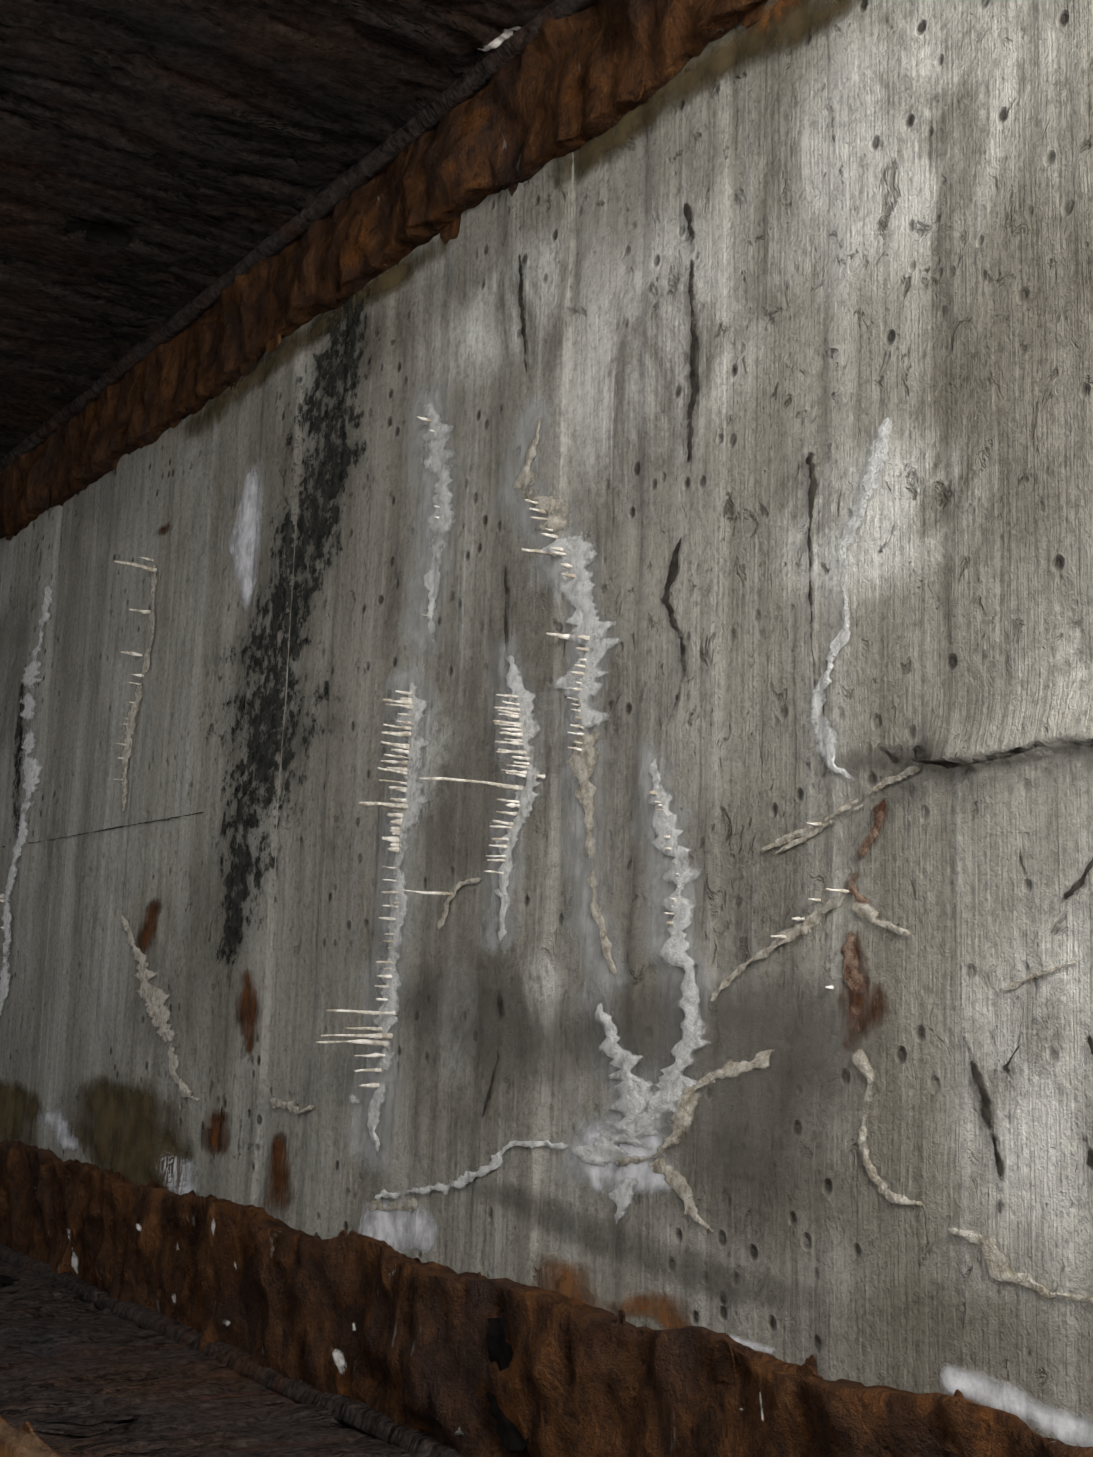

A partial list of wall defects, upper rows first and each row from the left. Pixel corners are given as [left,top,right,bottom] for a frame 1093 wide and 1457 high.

corrosion [555,0,854,179]
corrosion [186,242,446,434]
water stain [214,294,380,965]
water stain [315,393,848,1249]
crack [761,417,1093,1304]
corrosion [236,971,258,1054]
corrosion [0,1081,41,1142]
corrosion [71,1077,229,1190]
corrosion [264,1133,290,1211]
water stain [269,1098,315,1115]